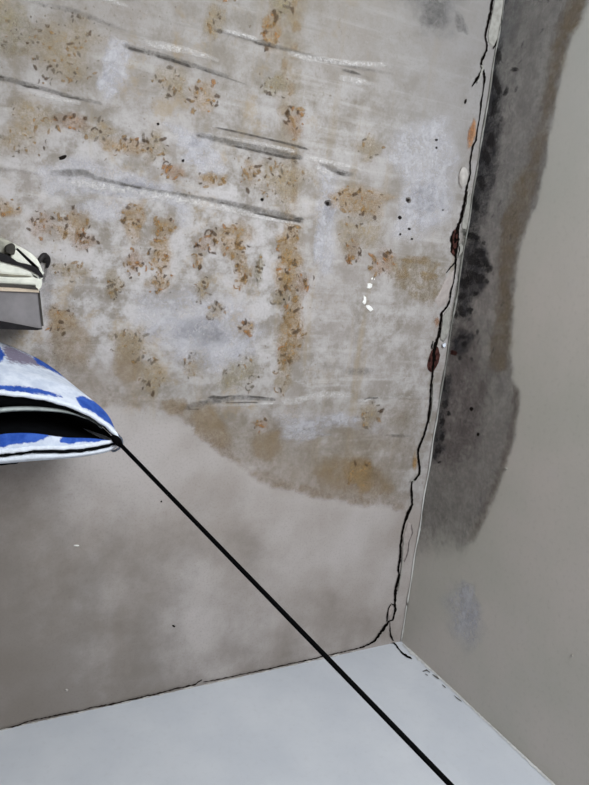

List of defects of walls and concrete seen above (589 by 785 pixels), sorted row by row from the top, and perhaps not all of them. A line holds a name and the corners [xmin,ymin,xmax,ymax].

rust [261,0,294,51]
rust [7,102,182,180]
rust [152,66,219,113]
rust [241,155,305,197]
rust [261,77,305,140]
rust [27,205,100,252]
rust [107,204,176,300]
rust [192,223,265,290]
rust [333,185,395,277]
damp [422,0,582,533]
rust [270,224,315,396]
crack [0,0,494,731]